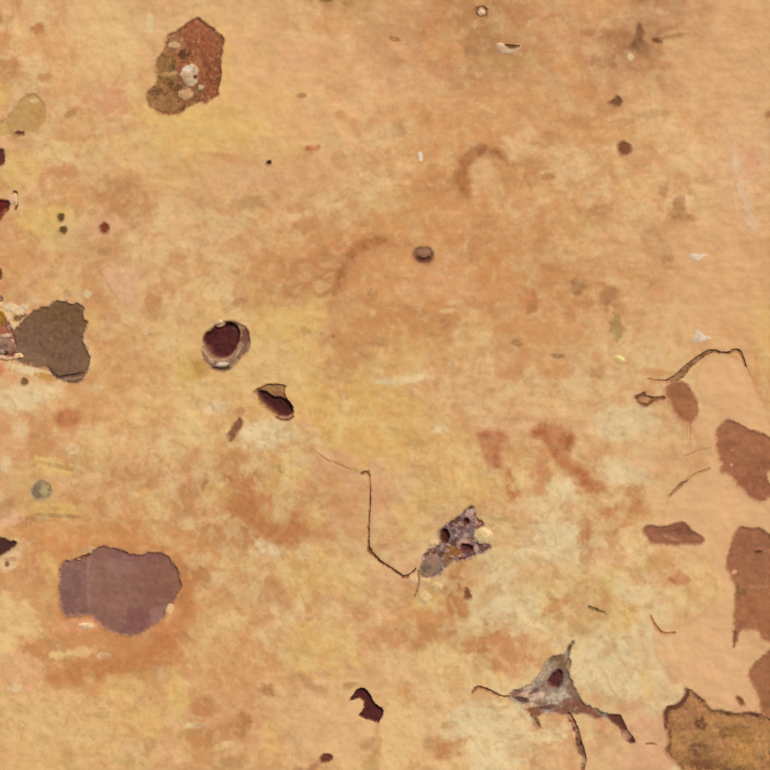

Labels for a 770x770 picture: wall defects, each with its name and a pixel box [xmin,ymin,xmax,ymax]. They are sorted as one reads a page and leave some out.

spalling [144,15,226,118]
spalling [0,294,92,388]
crack [645,347,764,395]
spalling [713,417,770,504]
spalling [0,534,20,575]
spalling [56,542,185,638]
crack [360,468,421,598]
spalling [418,503,493,580]
spalling [640,519,706,548]
spalling [660,524,770,770]
spalling [470,637,637,770]